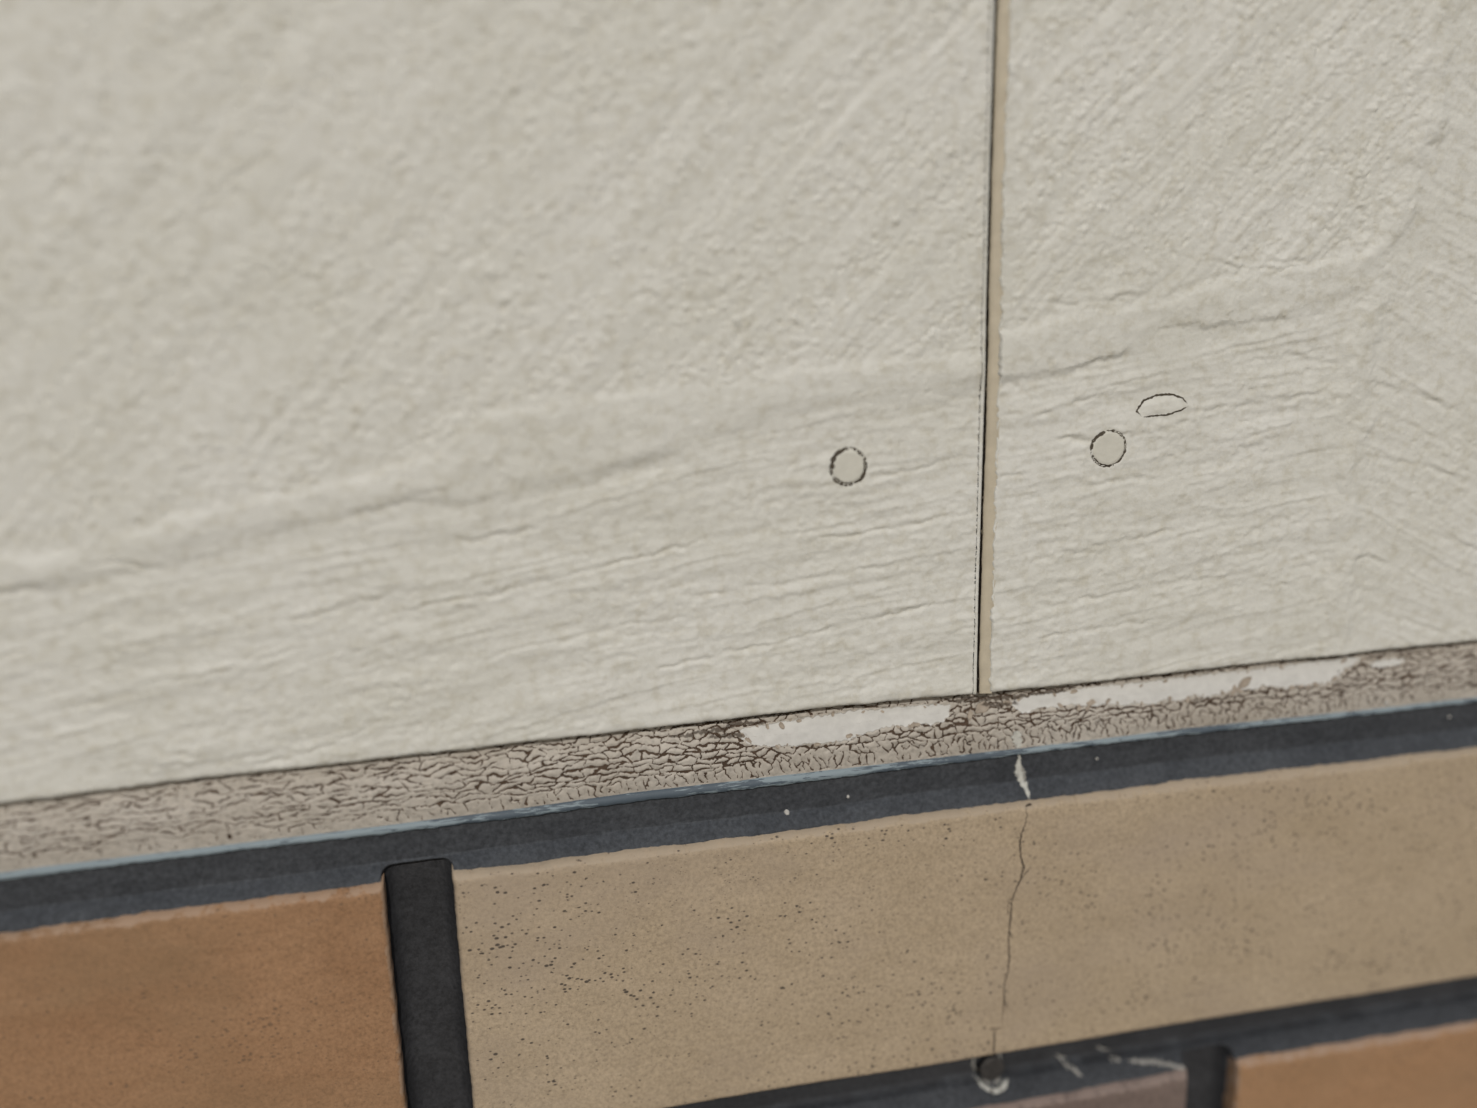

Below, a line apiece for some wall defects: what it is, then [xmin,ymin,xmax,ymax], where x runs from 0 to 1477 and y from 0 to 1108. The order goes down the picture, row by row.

crack [0,0,1477,864]
peeling [739,657,1405,749]
crack [990,803,1032,1056]